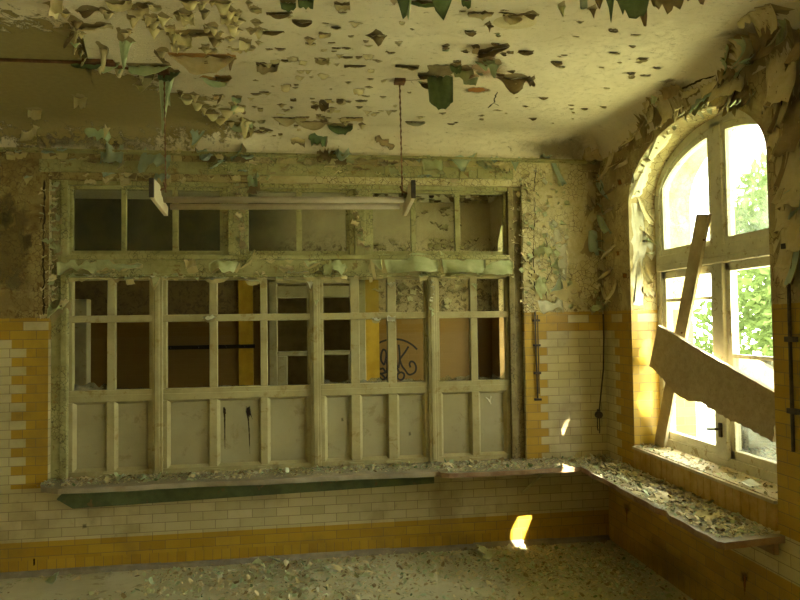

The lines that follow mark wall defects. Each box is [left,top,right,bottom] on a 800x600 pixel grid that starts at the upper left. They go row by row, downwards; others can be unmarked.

peeling [0,0,800,324]
crack [532,172,565,299]